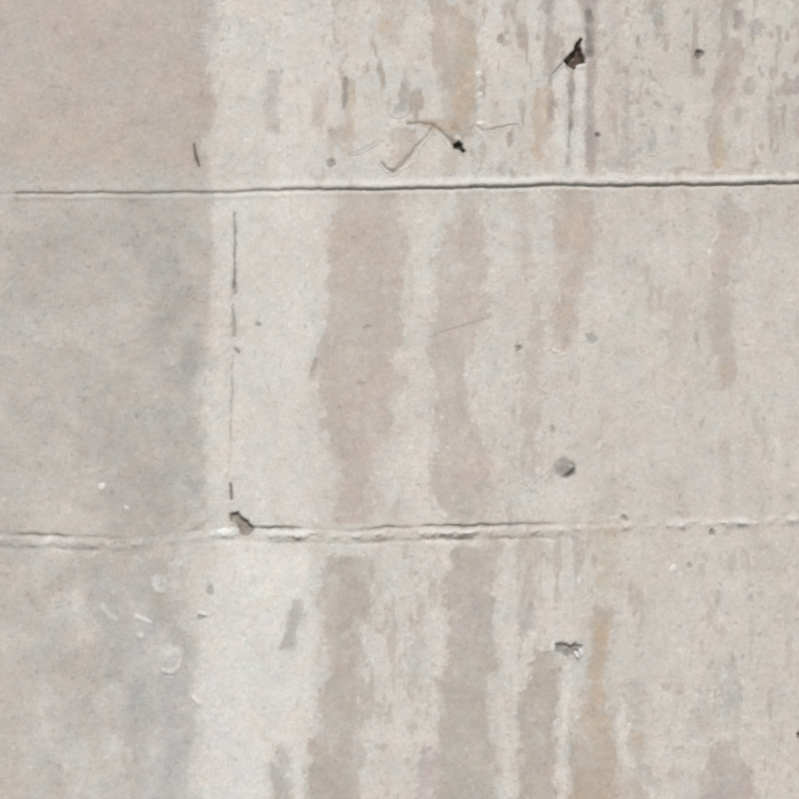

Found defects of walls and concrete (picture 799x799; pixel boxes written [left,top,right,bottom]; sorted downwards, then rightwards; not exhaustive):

crack [347,120,521,176]
spalling [551,36,588,177]
leakage [303,0,673,532]
crack [174,210,242,538]
spalling [206,509,280,551]
leakage [41,546,390,799]
leakage [397,544,576,799]
spalling [549,639,586,664]
leakage [608,678,664,799]